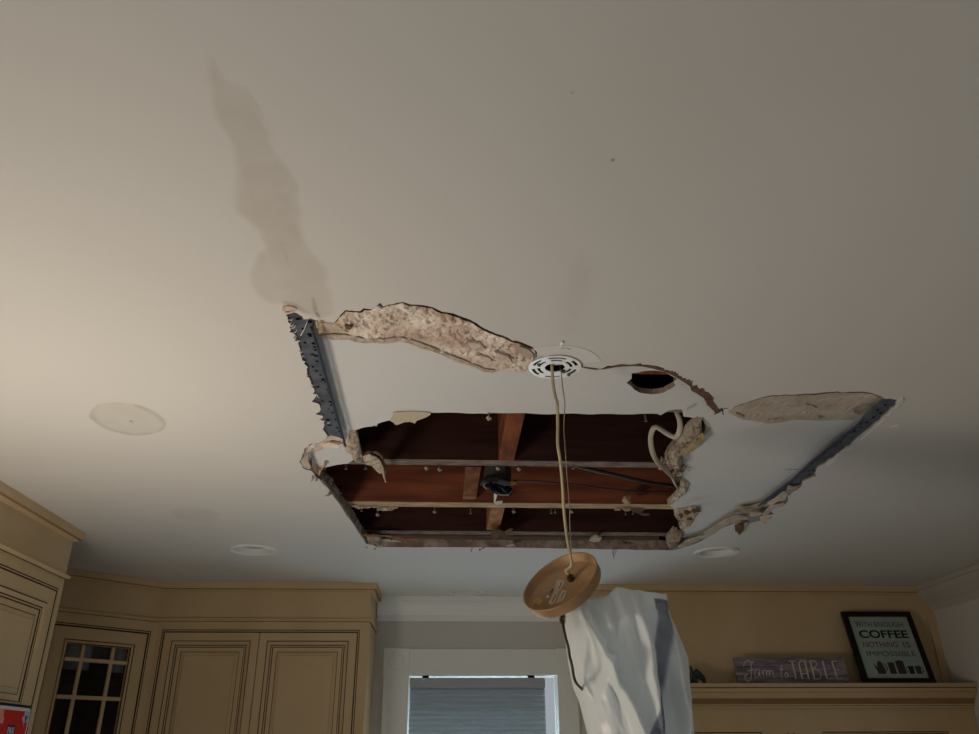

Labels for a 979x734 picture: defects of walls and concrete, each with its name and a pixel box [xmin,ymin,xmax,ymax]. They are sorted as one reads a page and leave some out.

flaking render [313,302,537,373]
crack [581,363,728,415]
flaking render [728,391,882,424]
flaking render [300,435,343,476]